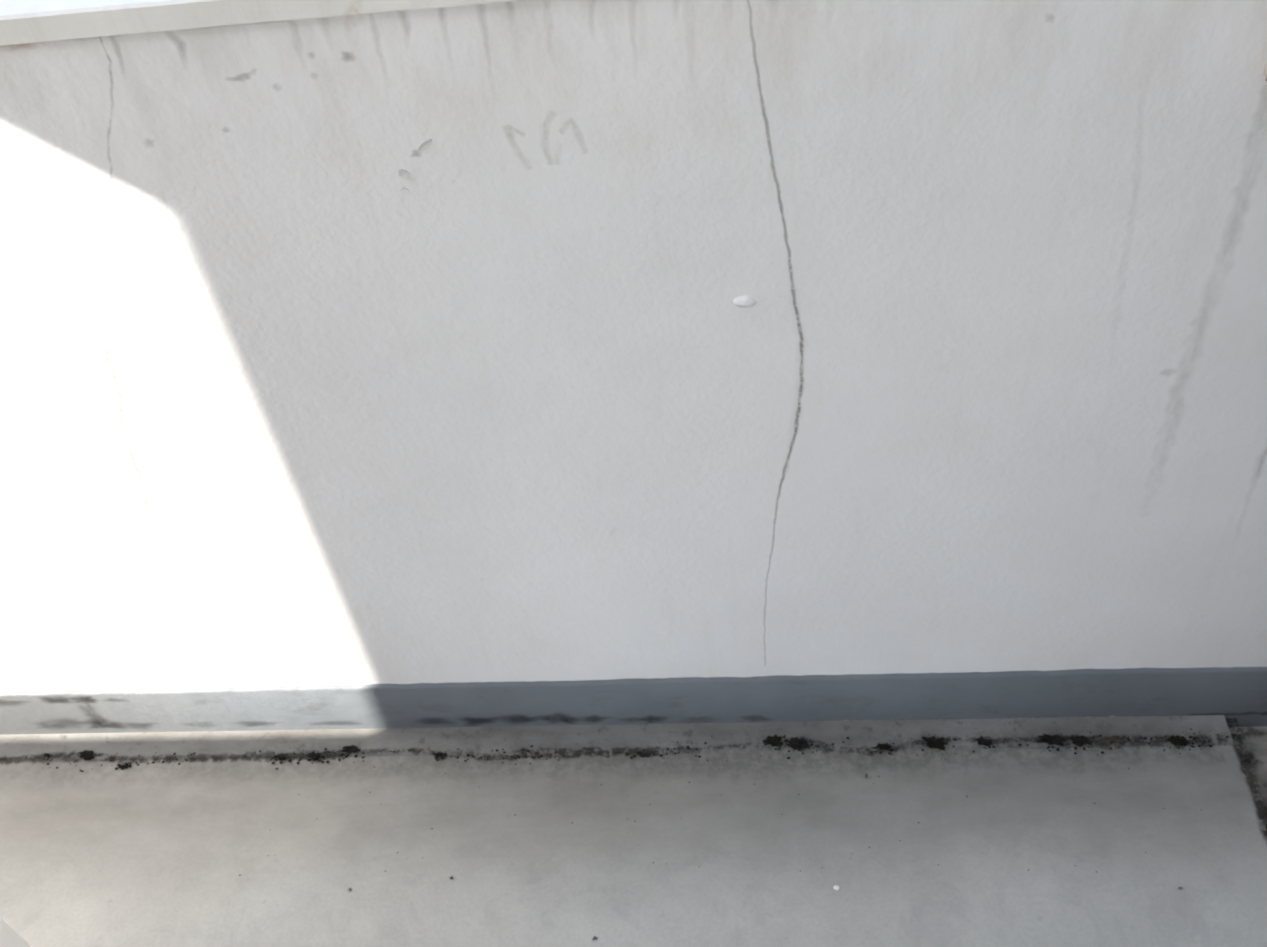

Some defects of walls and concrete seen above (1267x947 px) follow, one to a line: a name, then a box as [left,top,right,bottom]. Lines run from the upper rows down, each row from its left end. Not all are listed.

crack [785,285,803,468]
leakage [1219,713,1267,839]